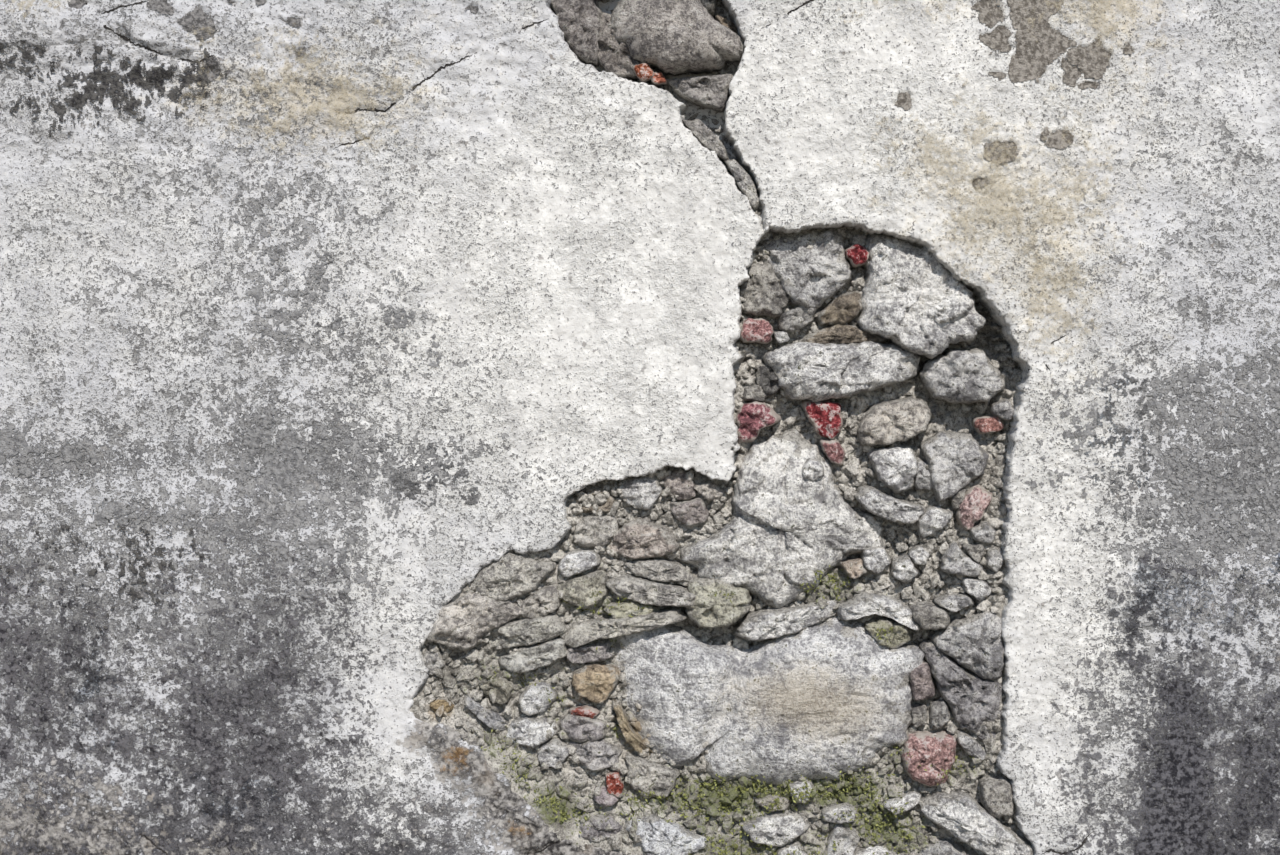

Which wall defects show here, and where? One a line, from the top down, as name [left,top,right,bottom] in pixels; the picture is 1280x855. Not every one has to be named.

peeling [282,16,301,27]
peeling [971,0,1135,89]
crack [334,52,477,149]
spalling [551,0,762,216]
peeling [895,92,912,110]
peeling [972,177,990,189]
peeling [983,140,1019,165]
peeling [1040,127,1074,150]
peeling [81,120,480,609]
spalling [409,225,1280,855]
leakage [0,498,394,855]
leakage [1057,550,1280,855]